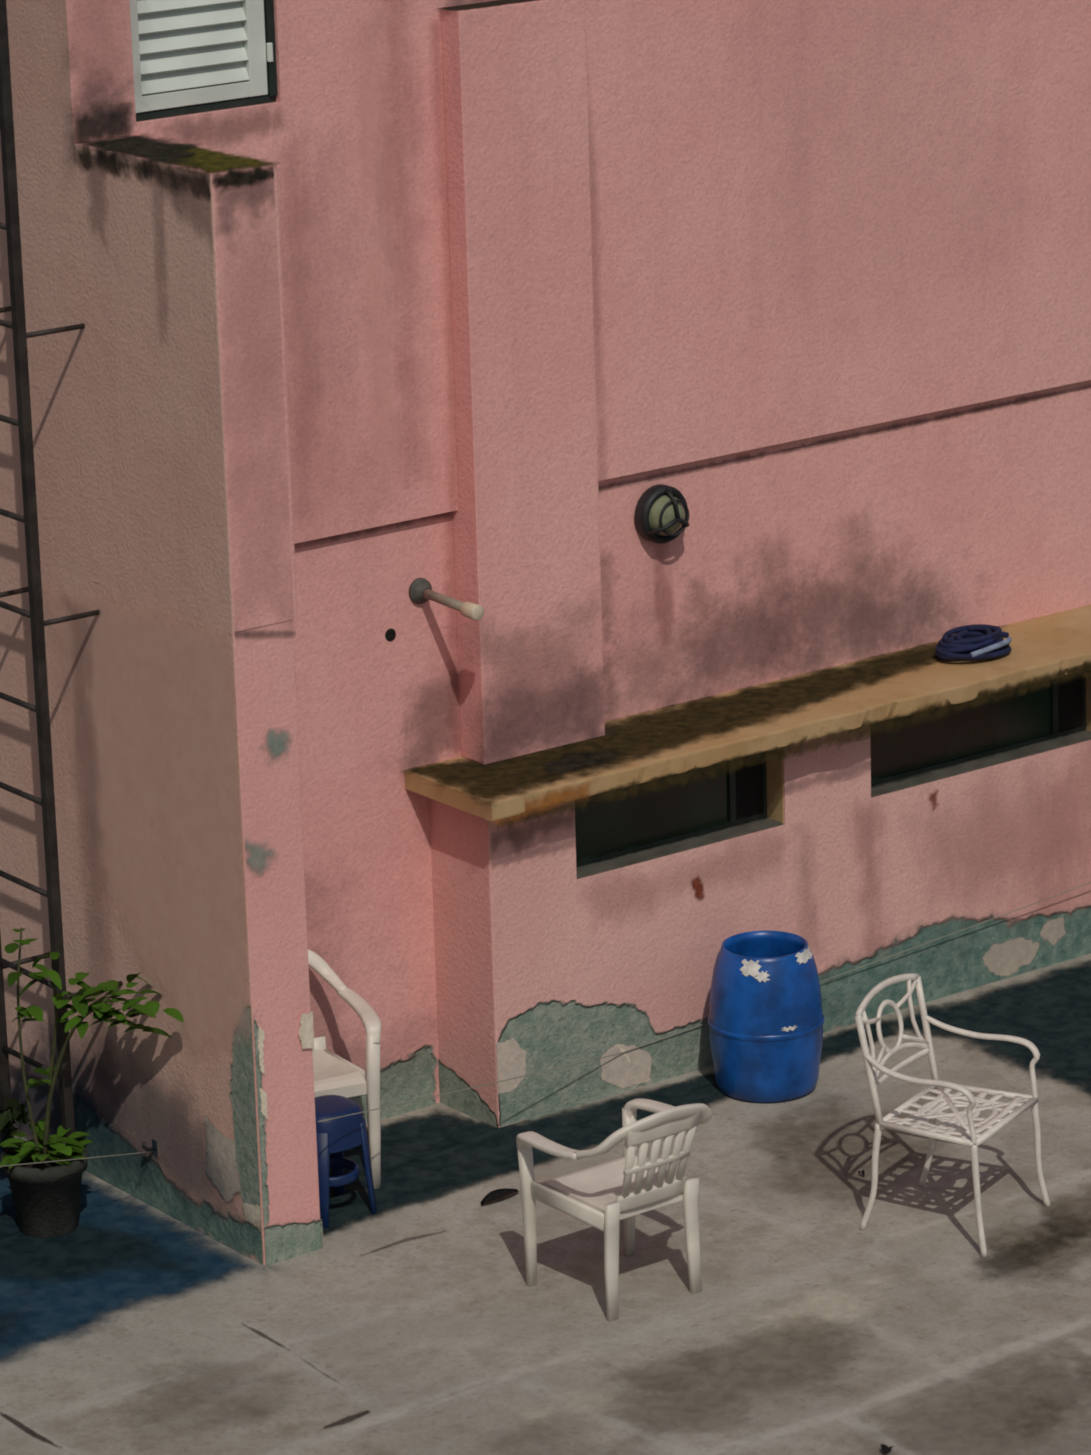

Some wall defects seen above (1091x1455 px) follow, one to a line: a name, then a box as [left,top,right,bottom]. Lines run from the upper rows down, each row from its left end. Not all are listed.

leakage [75,104,274,198]
corrosion [692,877,704,899]
peeling [818,905,1091,1033]
peeling [438,999,714,1128]
peeling [205,1005,323,1266]